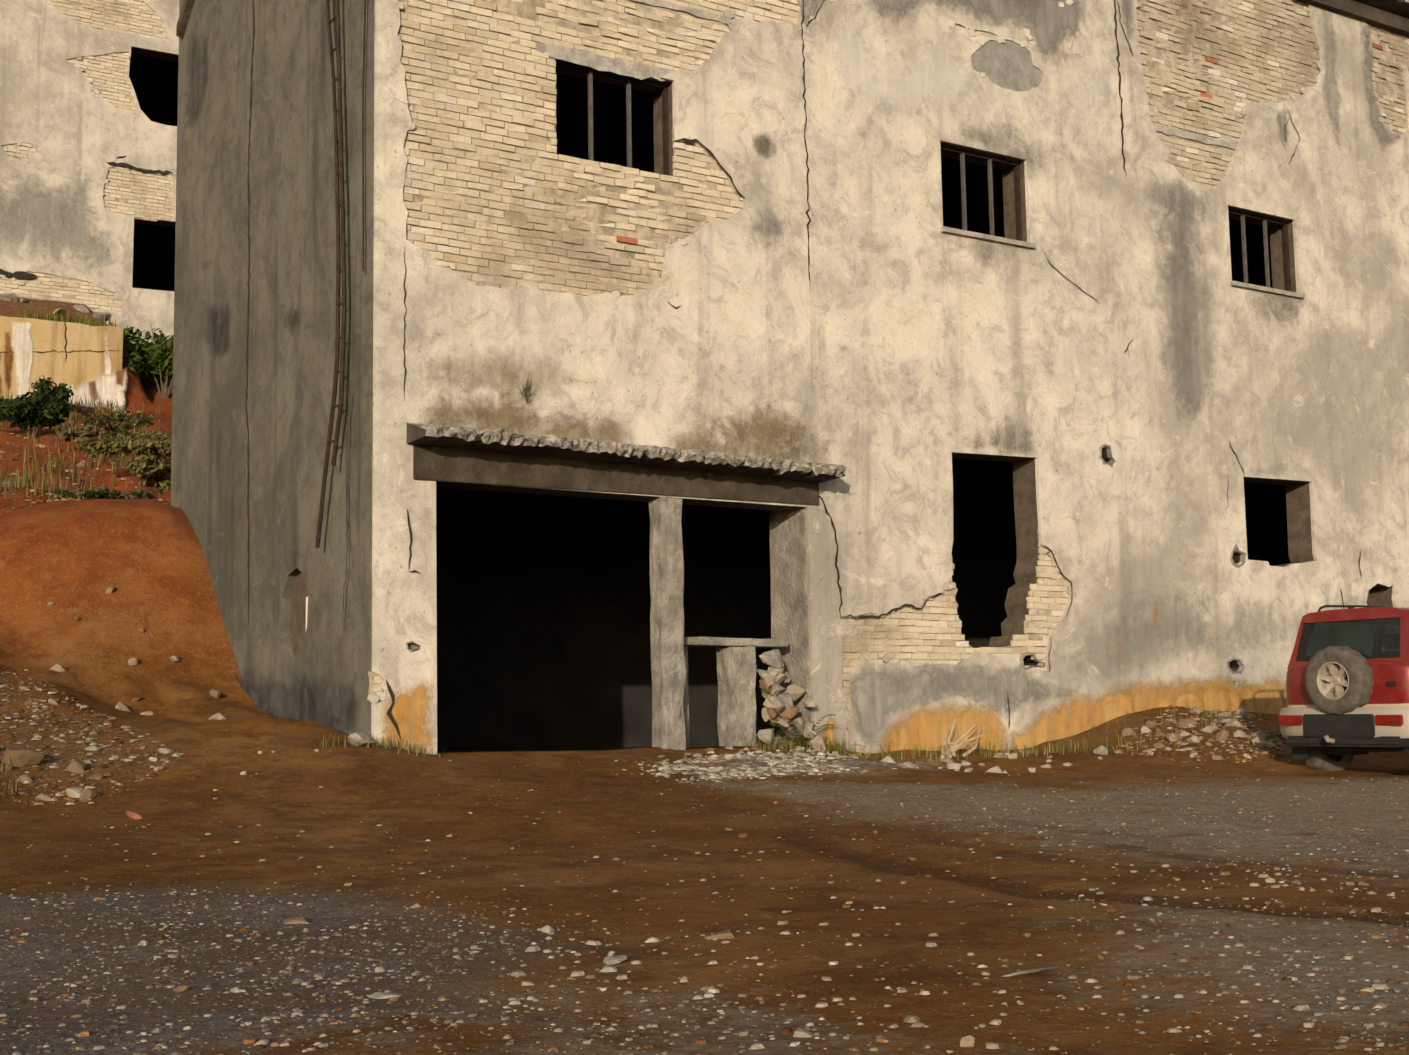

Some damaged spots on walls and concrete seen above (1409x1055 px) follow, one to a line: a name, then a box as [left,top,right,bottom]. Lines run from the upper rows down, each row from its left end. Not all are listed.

water stain [938,0,1080,55]
water stain [1123,0,1131,33]
flaking render [67,52,144,117]
crack [1114,0,1133,179]
flaking render [1135,0,1325,193]
flaking render [391,0,834,298]
crack [801,0,824,289]
flaking render [0,272,130,318]
water stain [12,323,33,397]
water stain [69,355,126,409]
flaking render [831,532,1076,752]
water stain [851,664,1286,752]